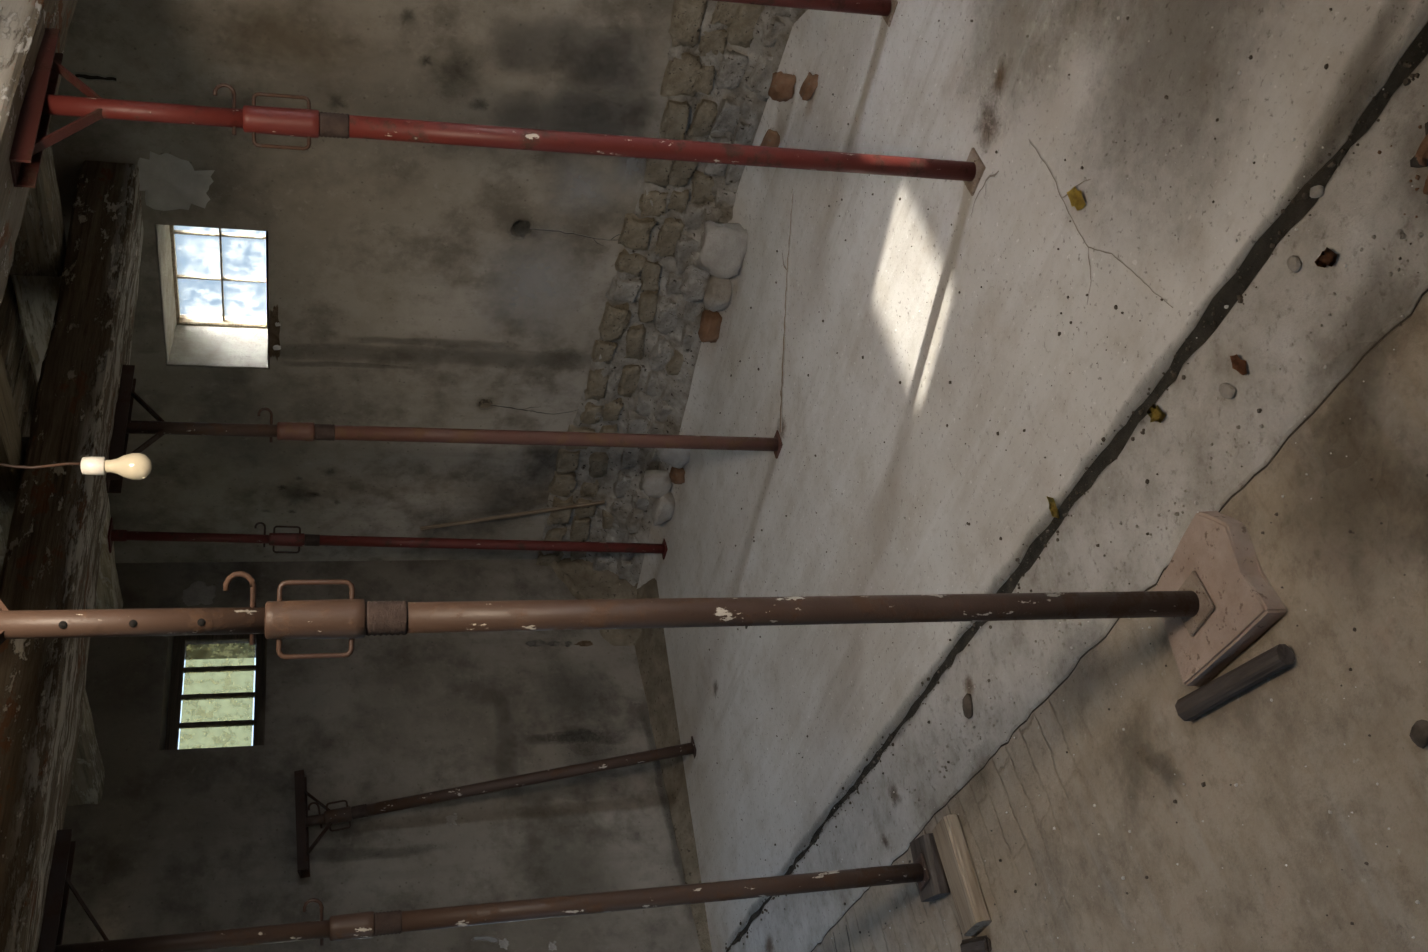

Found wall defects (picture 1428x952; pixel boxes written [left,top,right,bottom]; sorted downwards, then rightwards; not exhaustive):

spalling [656,0,808,145]
crack [970,170,999,216]
crack [1029,139,1173,308]
spalling [536,159,745,600]